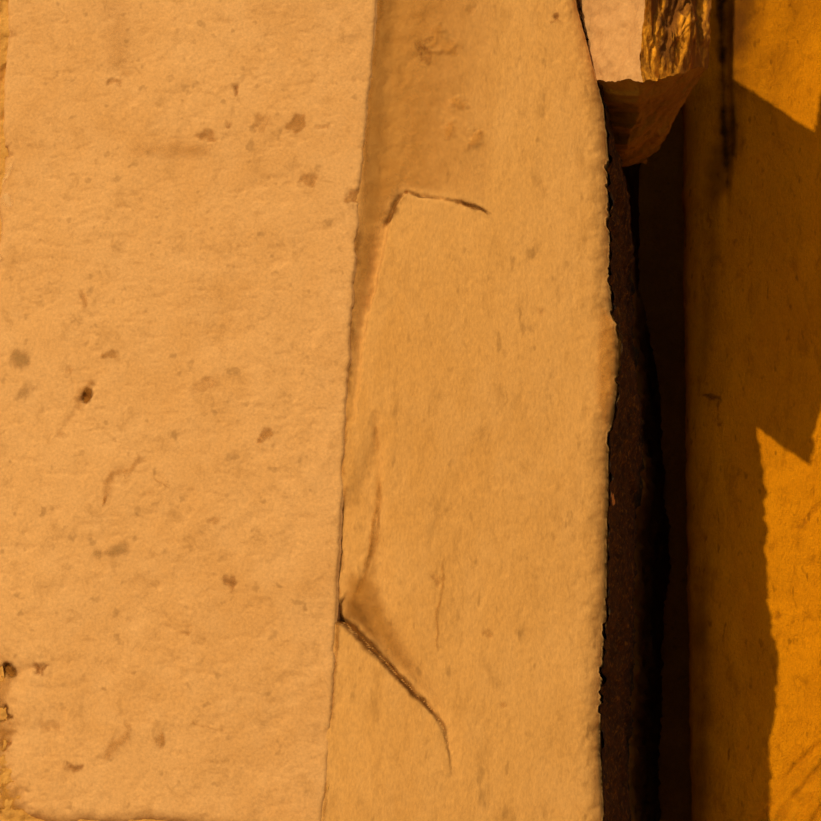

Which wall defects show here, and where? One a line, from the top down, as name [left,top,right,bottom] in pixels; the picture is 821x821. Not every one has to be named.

damp [726,0,751,52]
crack [336,618,440,719]